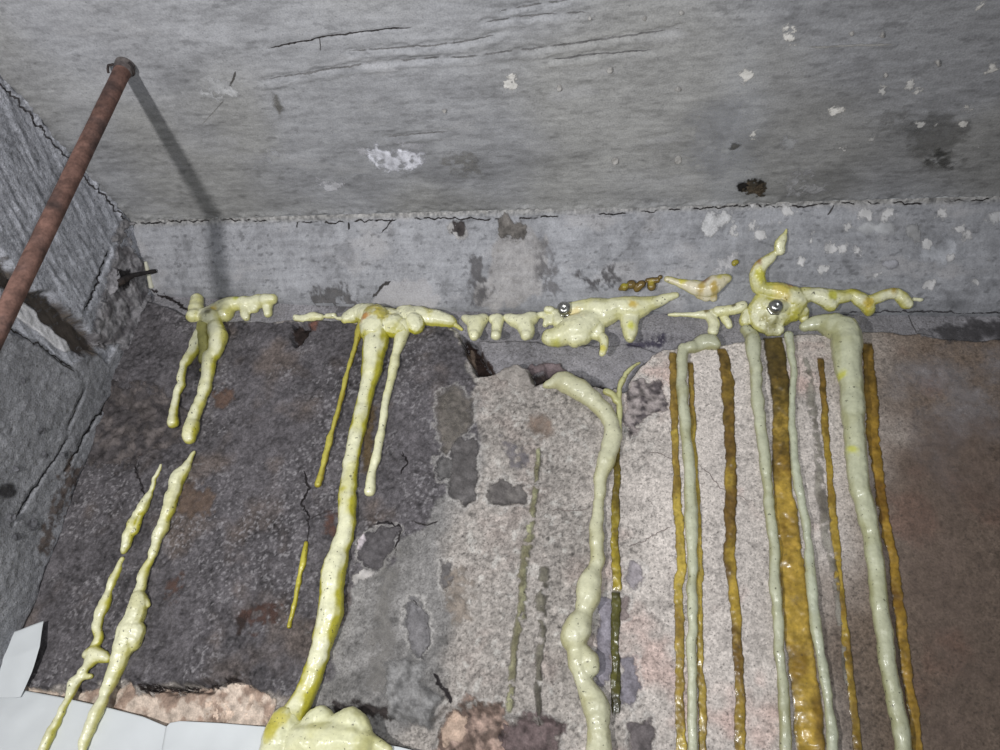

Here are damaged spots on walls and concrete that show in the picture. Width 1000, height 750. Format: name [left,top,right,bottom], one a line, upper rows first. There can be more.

crack [271,27,411,50]
crack [0,83,267,225]
efflorescence [358,143,423,173]
crack [599,201,921,215]
crack [296,215,558,232]
crack [84,251,108,311]